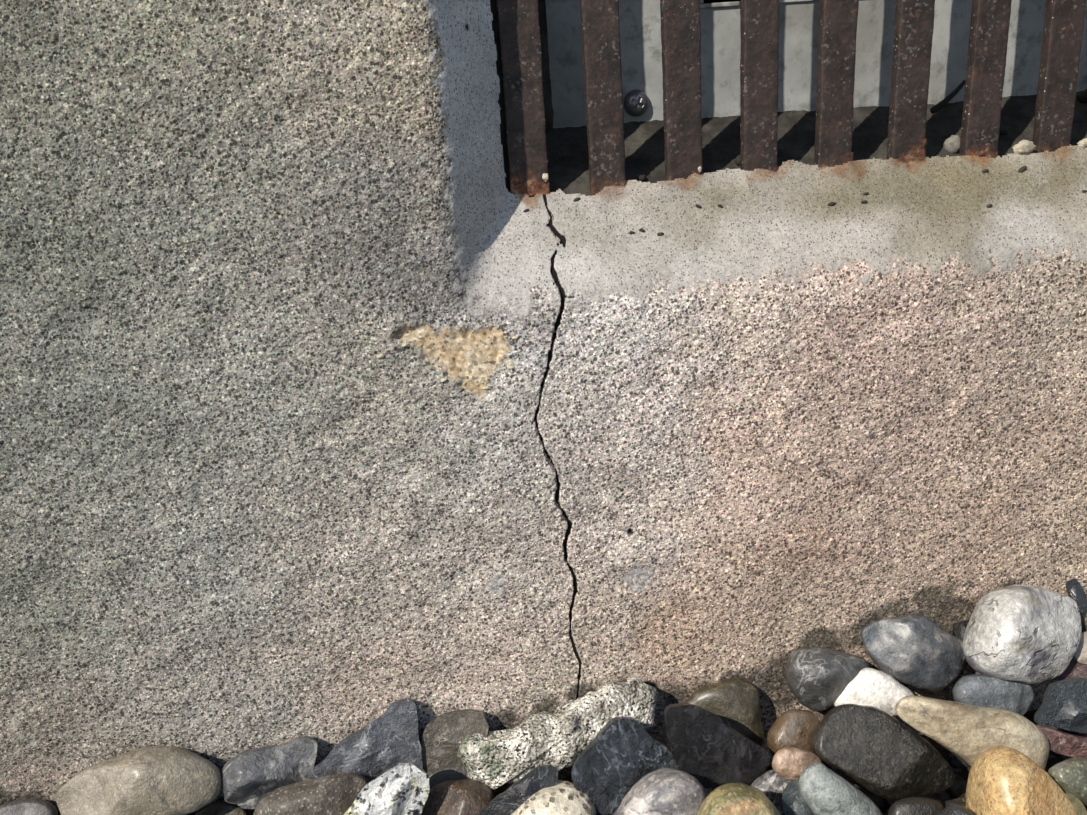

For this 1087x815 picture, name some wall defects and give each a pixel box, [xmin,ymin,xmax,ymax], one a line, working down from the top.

rust [511,172,549,204]
spalling [383,323,518,401]
crack [534,194,581,697]